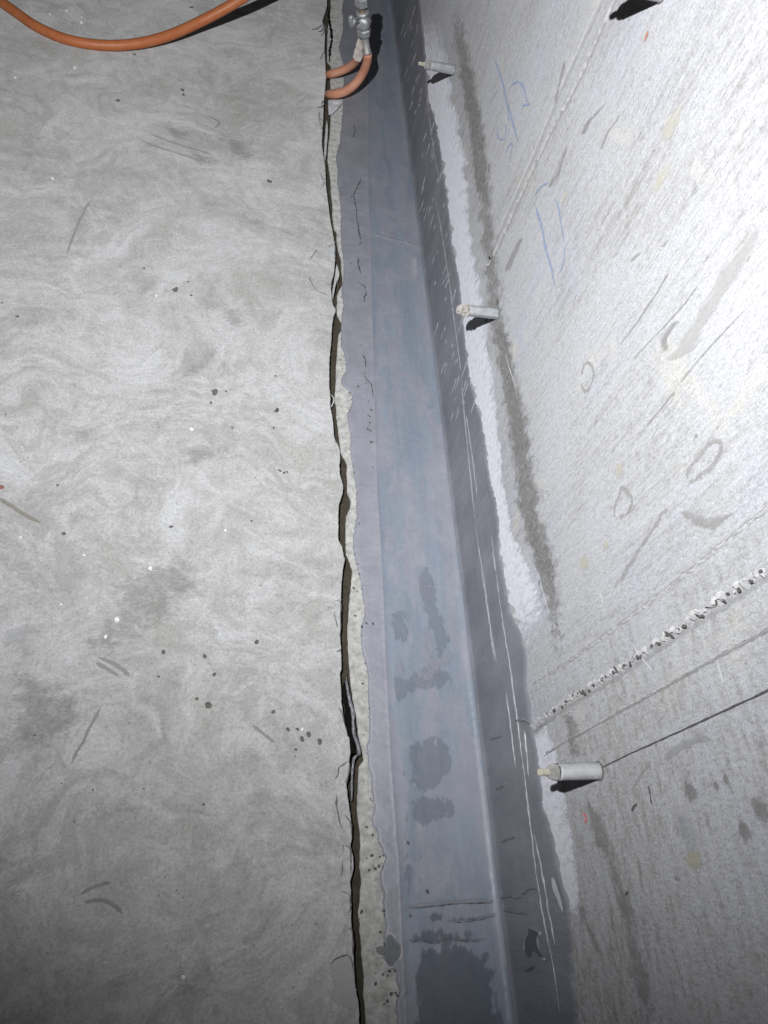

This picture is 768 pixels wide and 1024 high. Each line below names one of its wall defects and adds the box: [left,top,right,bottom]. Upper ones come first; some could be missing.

crack [322,0,367,1024]
leakage [423,21,559,645]